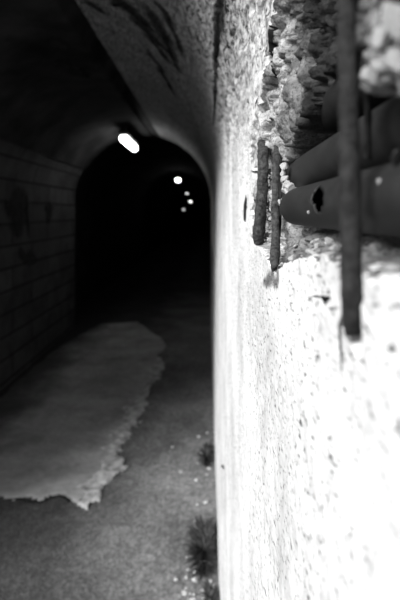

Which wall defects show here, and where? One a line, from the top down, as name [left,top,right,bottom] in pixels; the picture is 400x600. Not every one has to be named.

spalling [243,0,400,337]
rust [350,329,362,343]